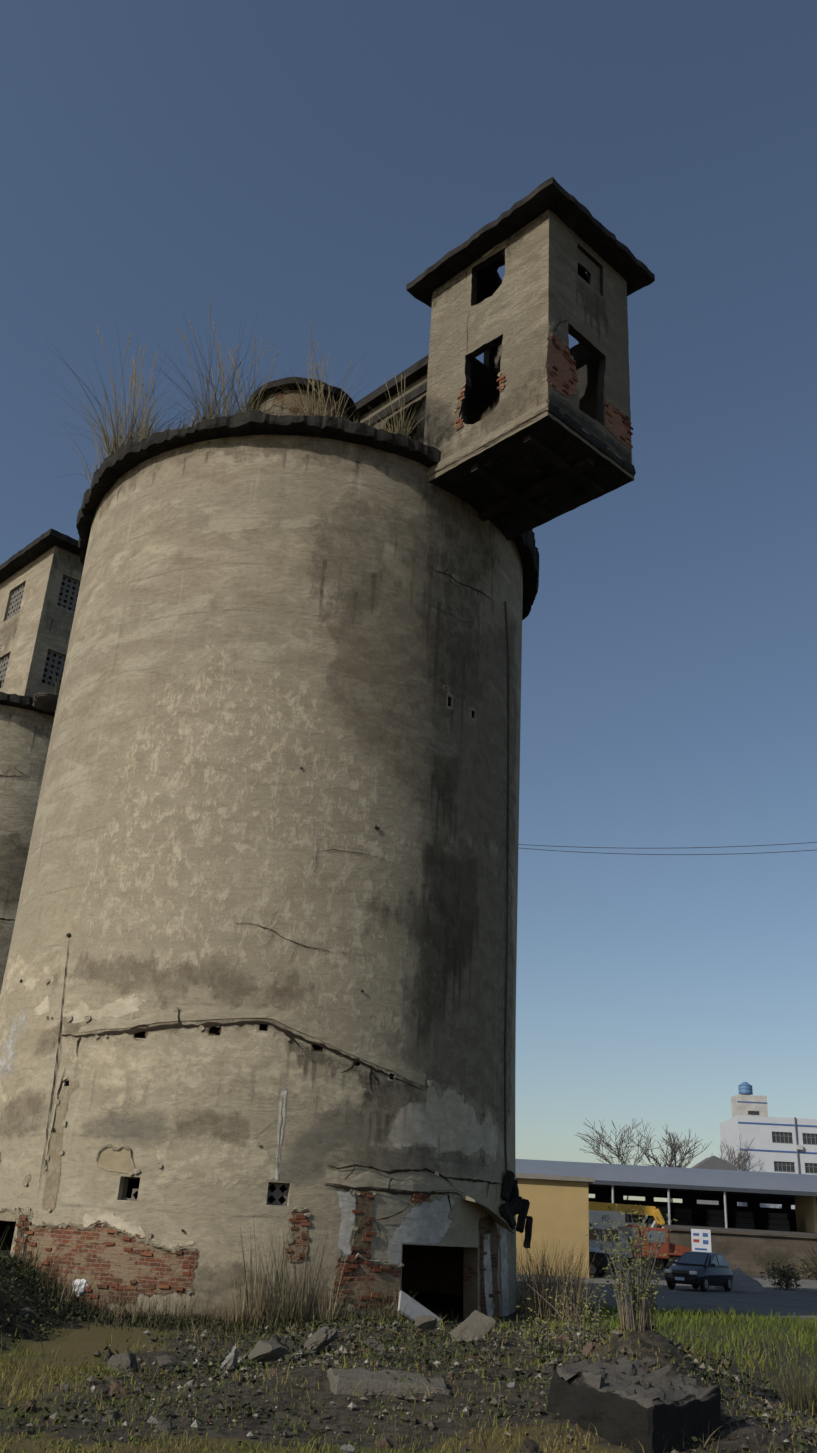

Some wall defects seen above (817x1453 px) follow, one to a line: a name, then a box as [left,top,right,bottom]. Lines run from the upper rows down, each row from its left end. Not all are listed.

spalling [453,384,465,431]
spalling [497,372,506,392]
spalling [545,333,579,397]
spalling [605,399,633,449]
peeling [0,641,424,1311]
crack [24,933,427,1249]
crack [325,1164,503,1245]
spalling [332,1189,455,1312]